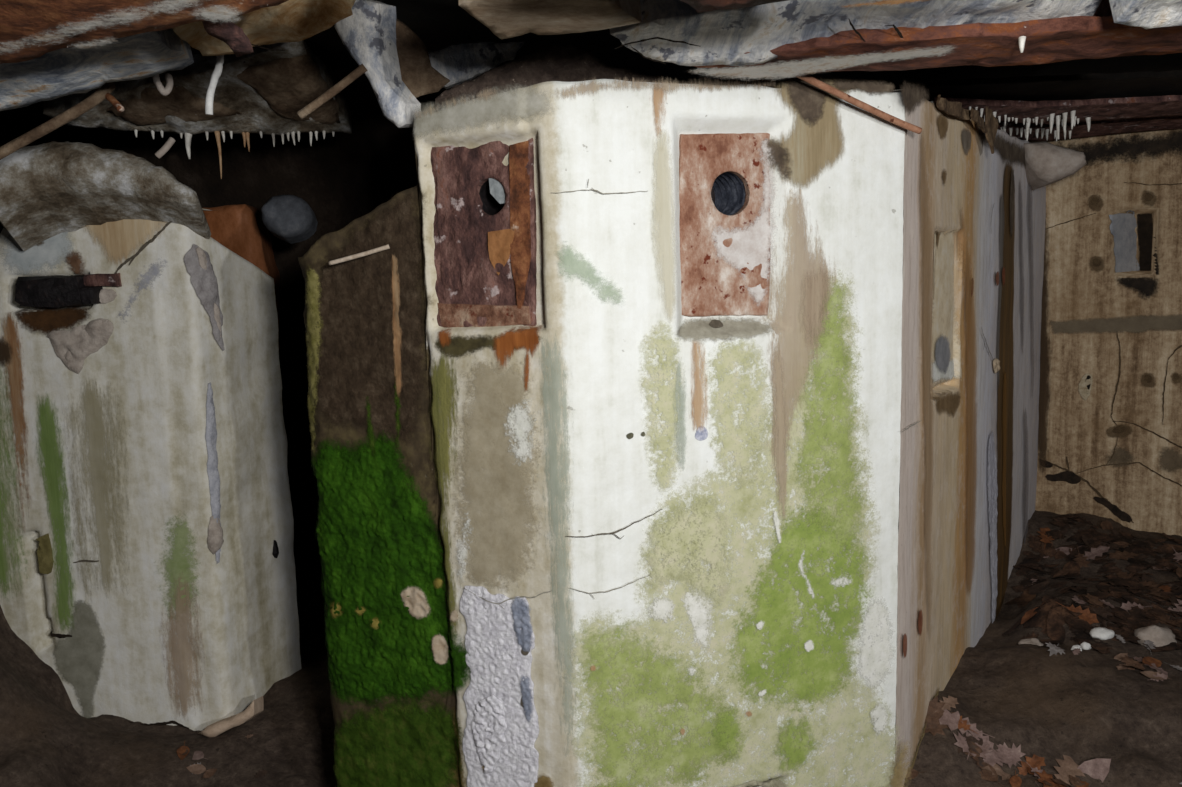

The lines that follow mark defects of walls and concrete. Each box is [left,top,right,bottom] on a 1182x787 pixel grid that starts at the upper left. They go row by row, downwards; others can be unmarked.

corrosion [436,141,539,390]
water stain [920,128,1182,629]
crack [1039,333,1182,523]
peeling [401,587,429,618]
peeling [432,634,448,664]
flaking render [450,586,539,787]
crack [567,509,662,539]